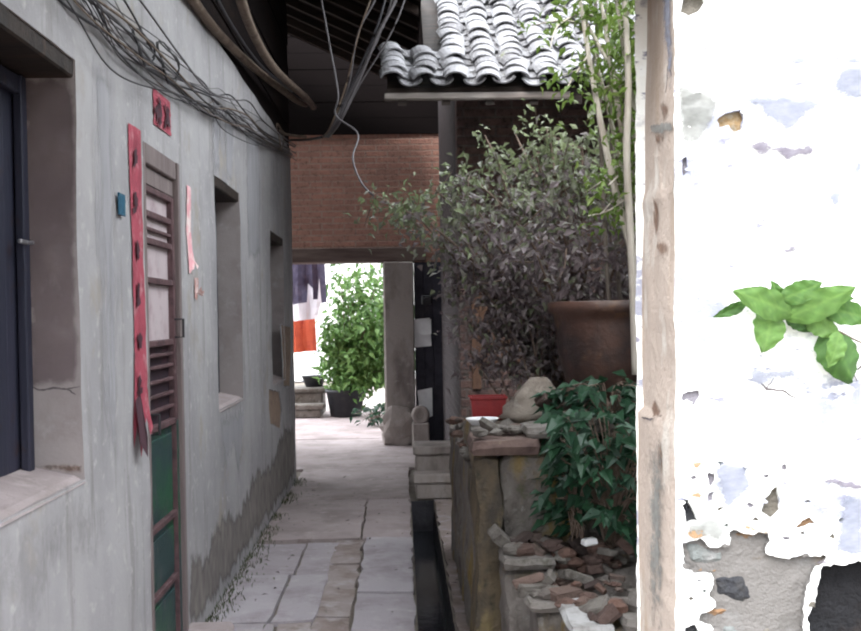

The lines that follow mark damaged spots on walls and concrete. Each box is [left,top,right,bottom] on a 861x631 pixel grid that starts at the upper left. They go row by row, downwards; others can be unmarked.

spalling [681,0,705,16]
spalling [717,110,745,132]
crack [33,386,80,395]
spalling [691,461,726,511]
spalling [678,499,700,524]
spalling [746,486,781,521]
leakage [190,429,295,621]
spalling [782,517,820,541]
spalling [682,523,826,631]